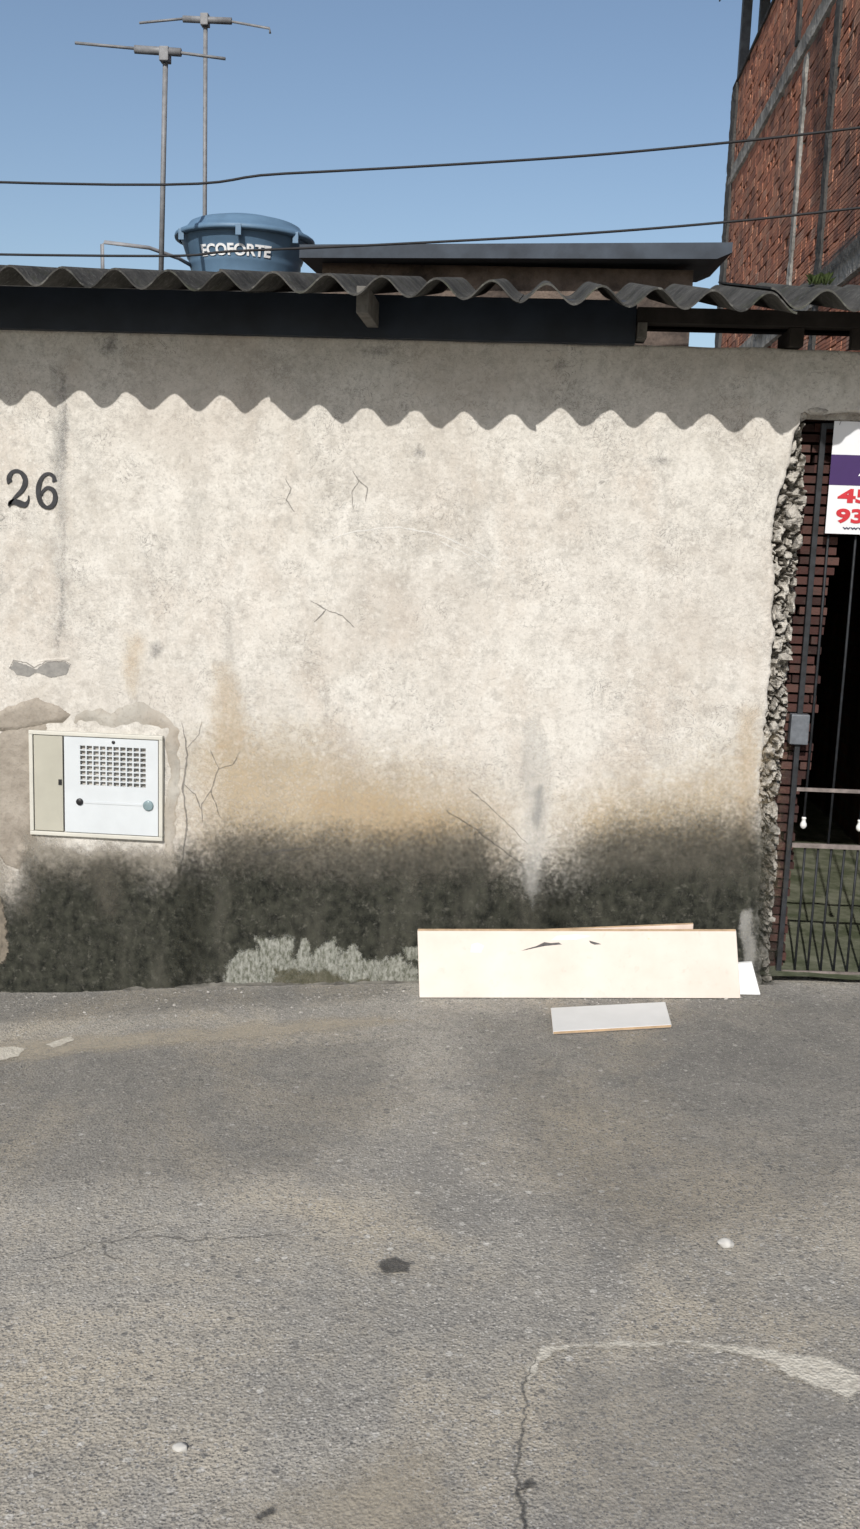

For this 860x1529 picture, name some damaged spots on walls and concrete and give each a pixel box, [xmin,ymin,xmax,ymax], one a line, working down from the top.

damp [0,754,773,993]
peeling [0,898,9,964]
peeling [224,937,419,984]